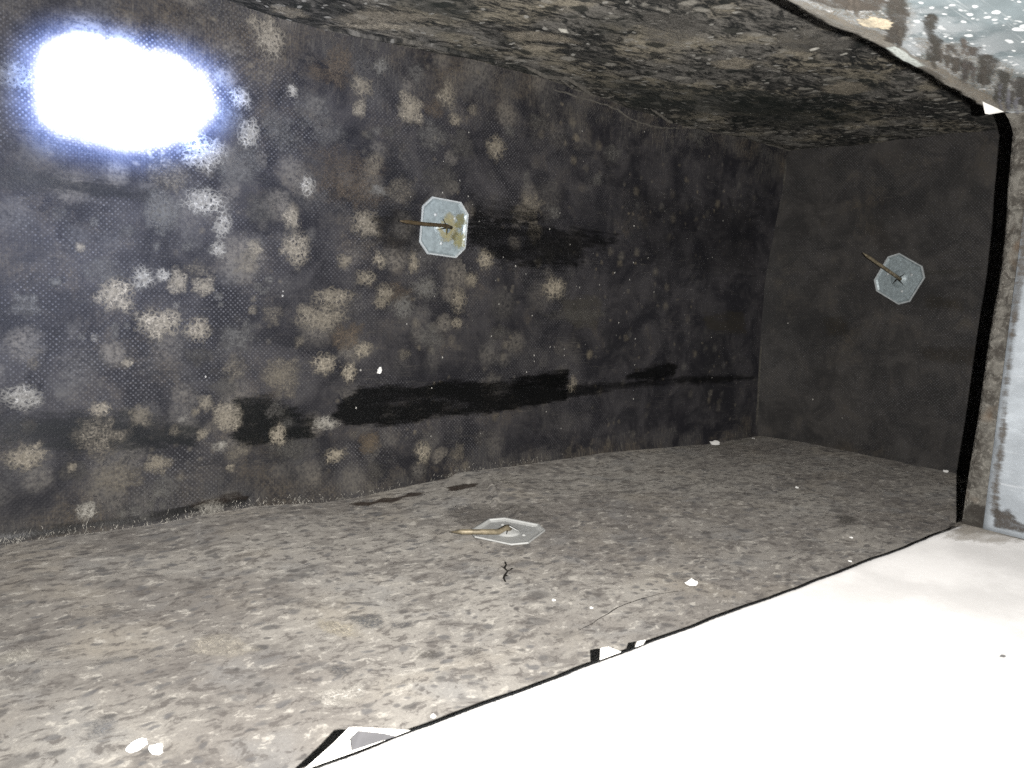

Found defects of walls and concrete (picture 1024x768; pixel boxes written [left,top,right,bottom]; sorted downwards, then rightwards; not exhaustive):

mould [250,14,283,56]
mould [0,61,27,88]
mould [312,49,386,115]
mould [400,83,471,156]
mould [145,89,291,255]
mould [301,155,409,198]
mould [247,196,306,264]
mould [355,212,378,235]
leakage [467,195,613,267]
mould [86,260,223,365]
leakage [3,273,747,478]
mould [76,503,98,518]